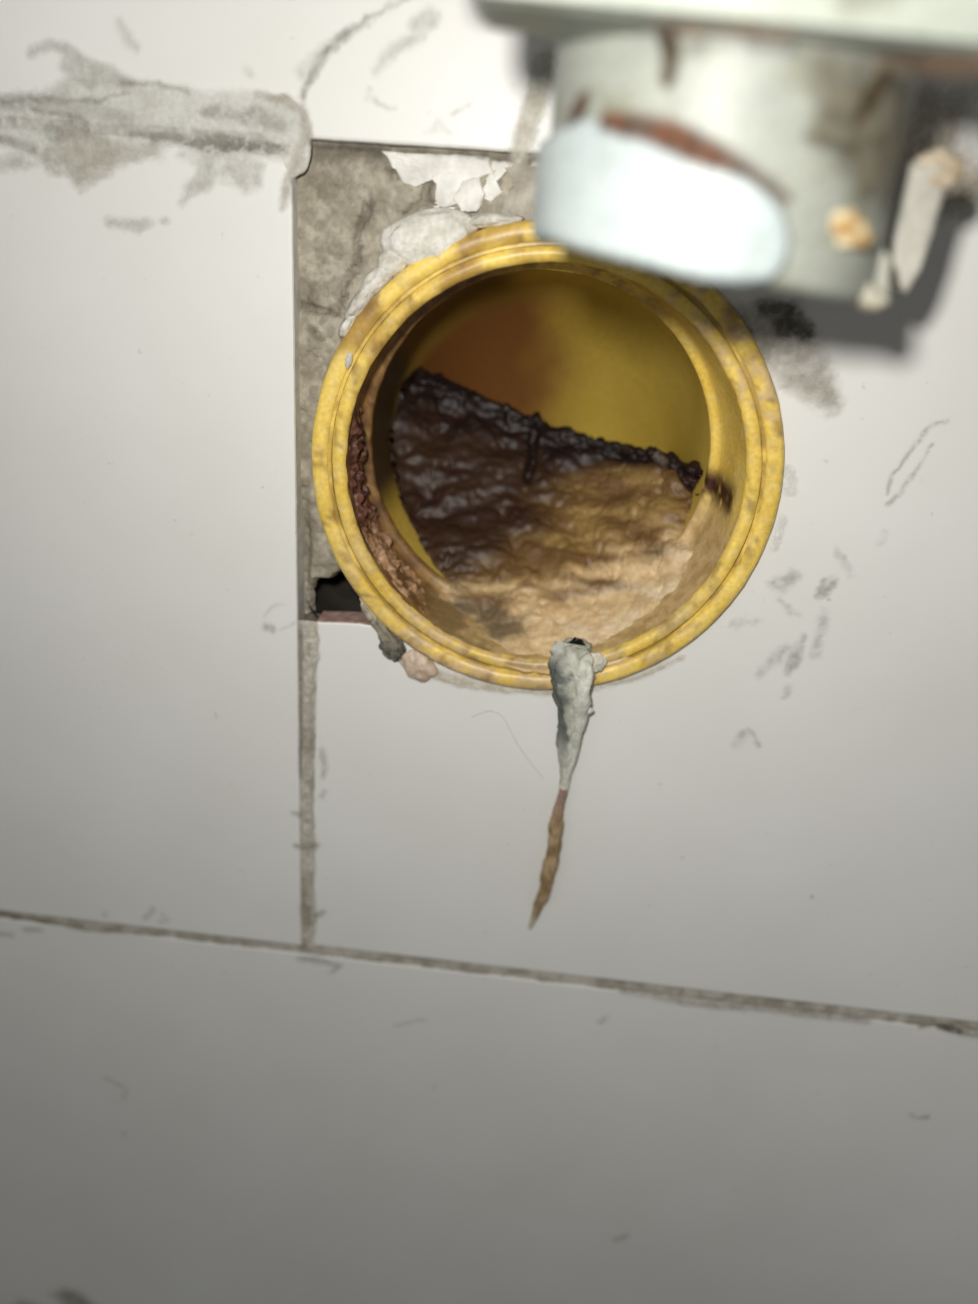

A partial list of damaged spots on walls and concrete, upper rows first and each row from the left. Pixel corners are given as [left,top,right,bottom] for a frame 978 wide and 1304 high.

spalling [296,141,537,619]